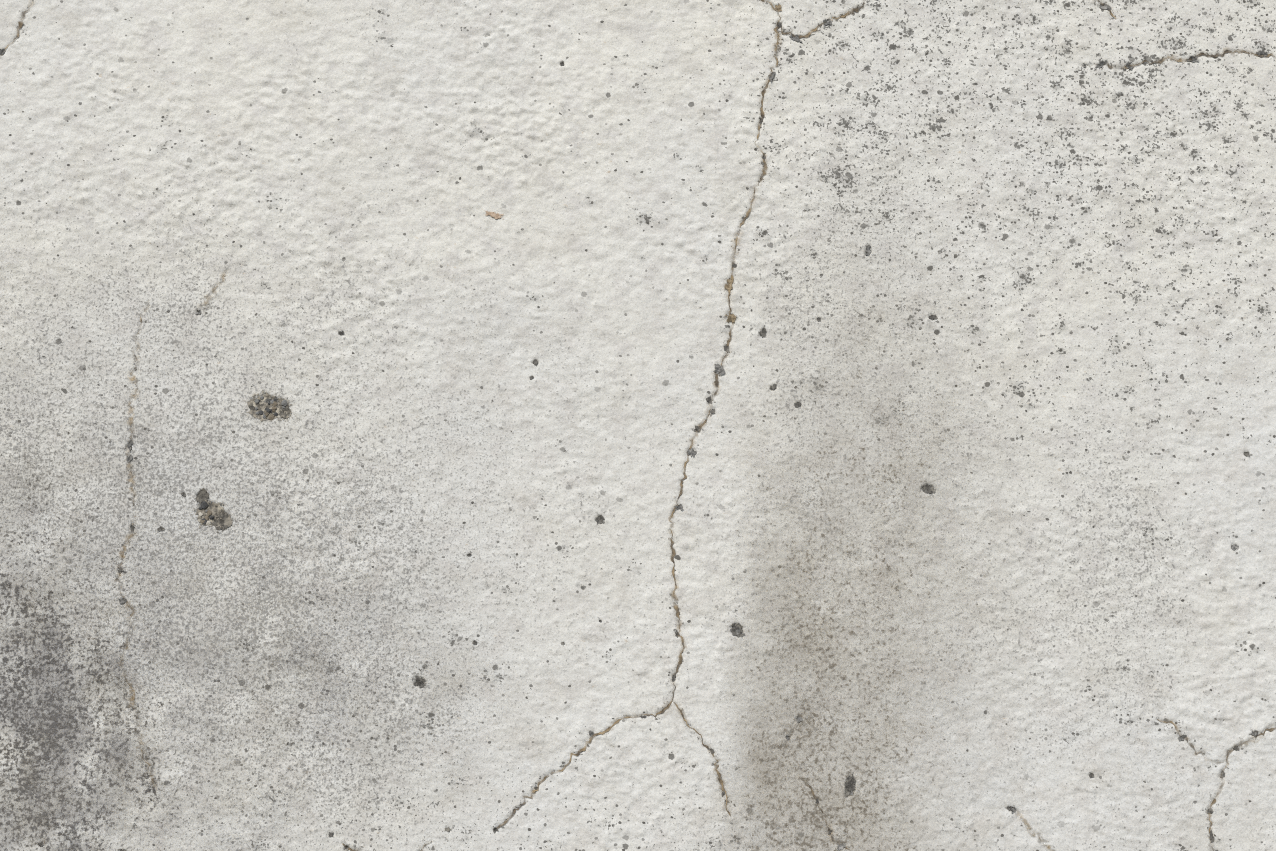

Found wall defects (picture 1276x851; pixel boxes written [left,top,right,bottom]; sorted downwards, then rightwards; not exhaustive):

crack [0,10,28,55]
crack [1099,3,1117,19]
crack [1083,50,1273,70]
crack [493,0,864,833]
leakage [737,338,956,851]
leakage [0,454,201,851]
crack [1157,719,1276,851]
crack [328,832,359,851]
crack [1011,807,1050,848]